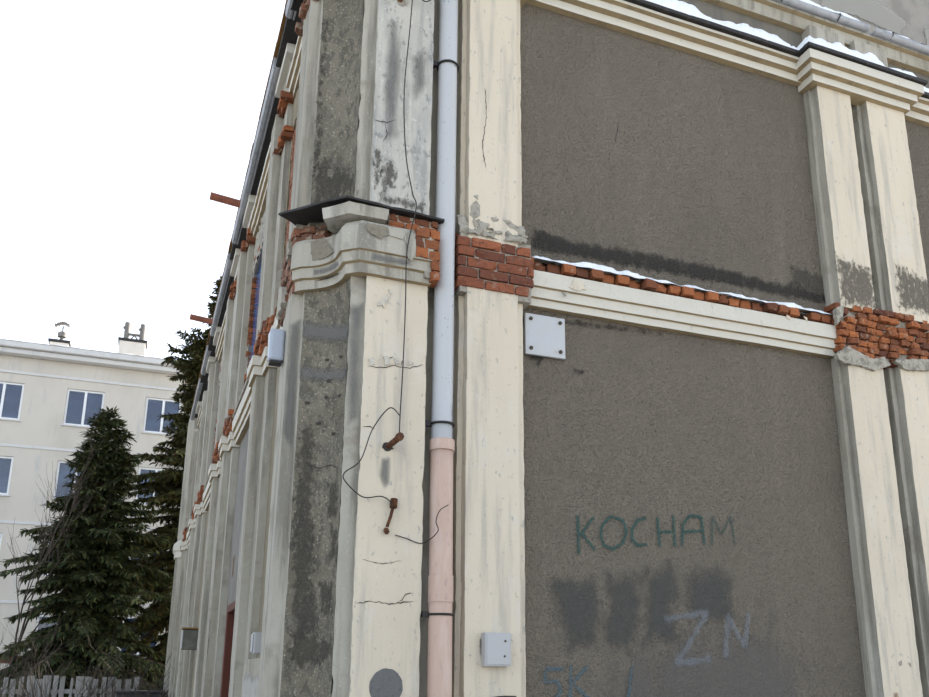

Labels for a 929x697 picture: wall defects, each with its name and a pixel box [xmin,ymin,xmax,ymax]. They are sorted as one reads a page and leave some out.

spalling [290,0,319,37]
damp [311,21,358,203]
spalling [229,280,237,300]
spalling [239,89,334,387]
spalling [367,214,440,288]
spalling [454,195,534,310]
peeling [562,278,586,296]
spalling [824,302,929,372]
spalling [212,385,235,464]
spalling [182,485,205,542]
damp [285,308,360,668]